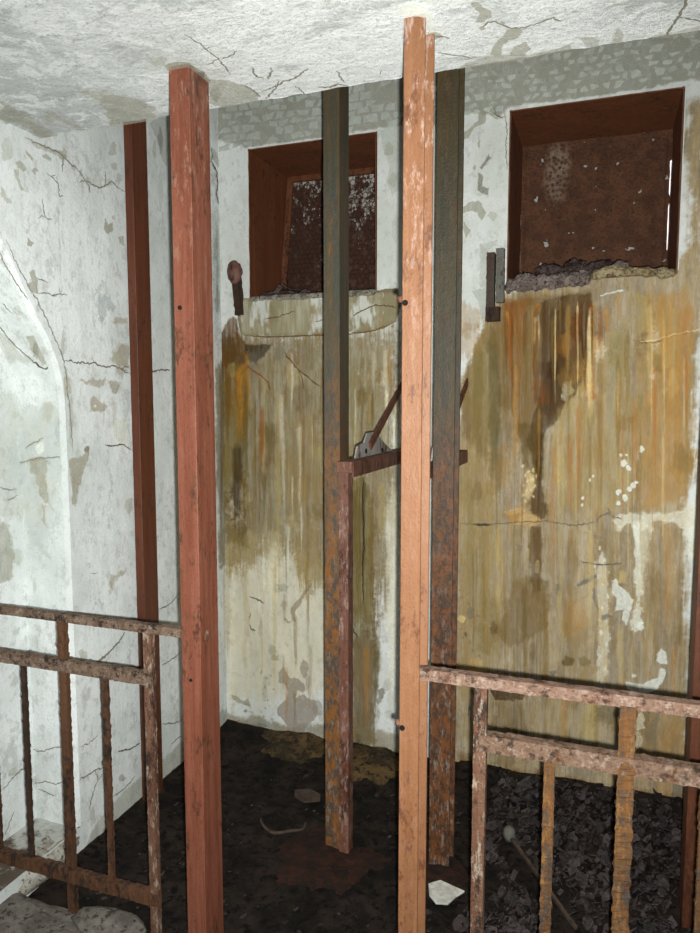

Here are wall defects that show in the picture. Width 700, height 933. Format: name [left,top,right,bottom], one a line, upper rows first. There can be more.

crack [184,34,347,98]
crack [25,137,125,220]
peeling [463,156,490,219]
peeling [28,270,67,297]
peeling [474,288,486,317]
peeling [591,260,675,280]
crack [0,241,130,463]
damp [349,324,401,459]
damp [457,104,700,698]
damp [216,335,325,593]
damp [488,689,619,750]
crack [3,735,140,810]